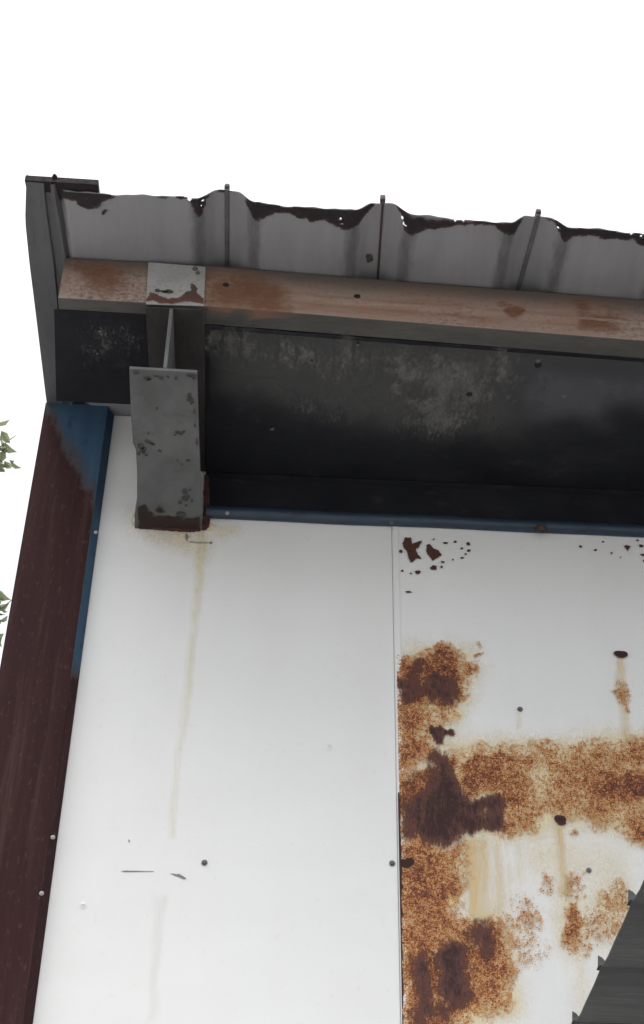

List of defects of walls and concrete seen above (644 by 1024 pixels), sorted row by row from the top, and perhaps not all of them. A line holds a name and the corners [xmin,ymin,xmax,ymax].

rust [61,190,115,215]
rust [245,198,374,230]
rust [397,206,523,236]
rust [545,218,644,246]
rust [146,284,204,304]
rust [133,475,214,541]
rust [397,640,644,1024]